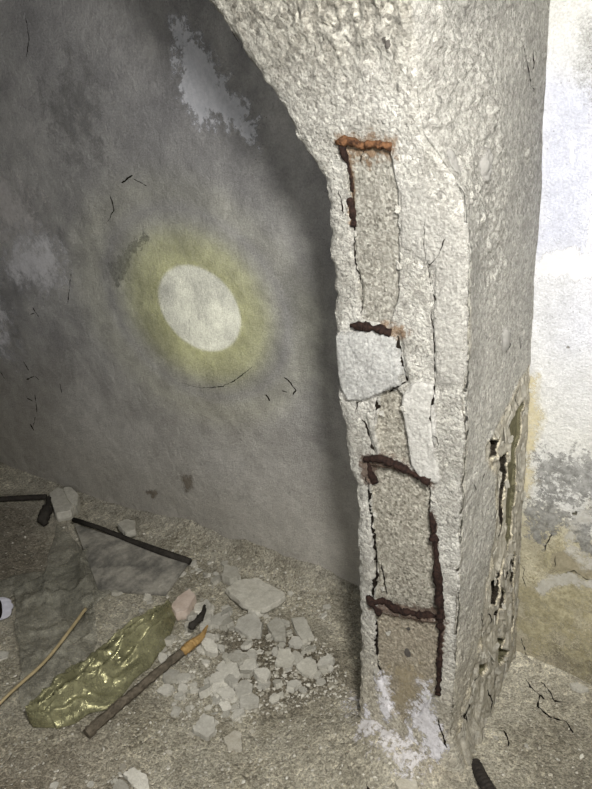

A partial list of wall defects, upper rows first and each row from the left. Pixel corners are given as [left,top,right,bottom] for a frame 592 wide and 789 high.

rust [347,132,397,209]
spalling [346,146,402,324]
rust [382,320,410,339]
rust [359,452,415,485]
spalling [376,388,411,464]
spalling [371,467,439,721]
flaking render [457,365,530,766]
damp [517,378,592,683]
damp [341,662,450,781]